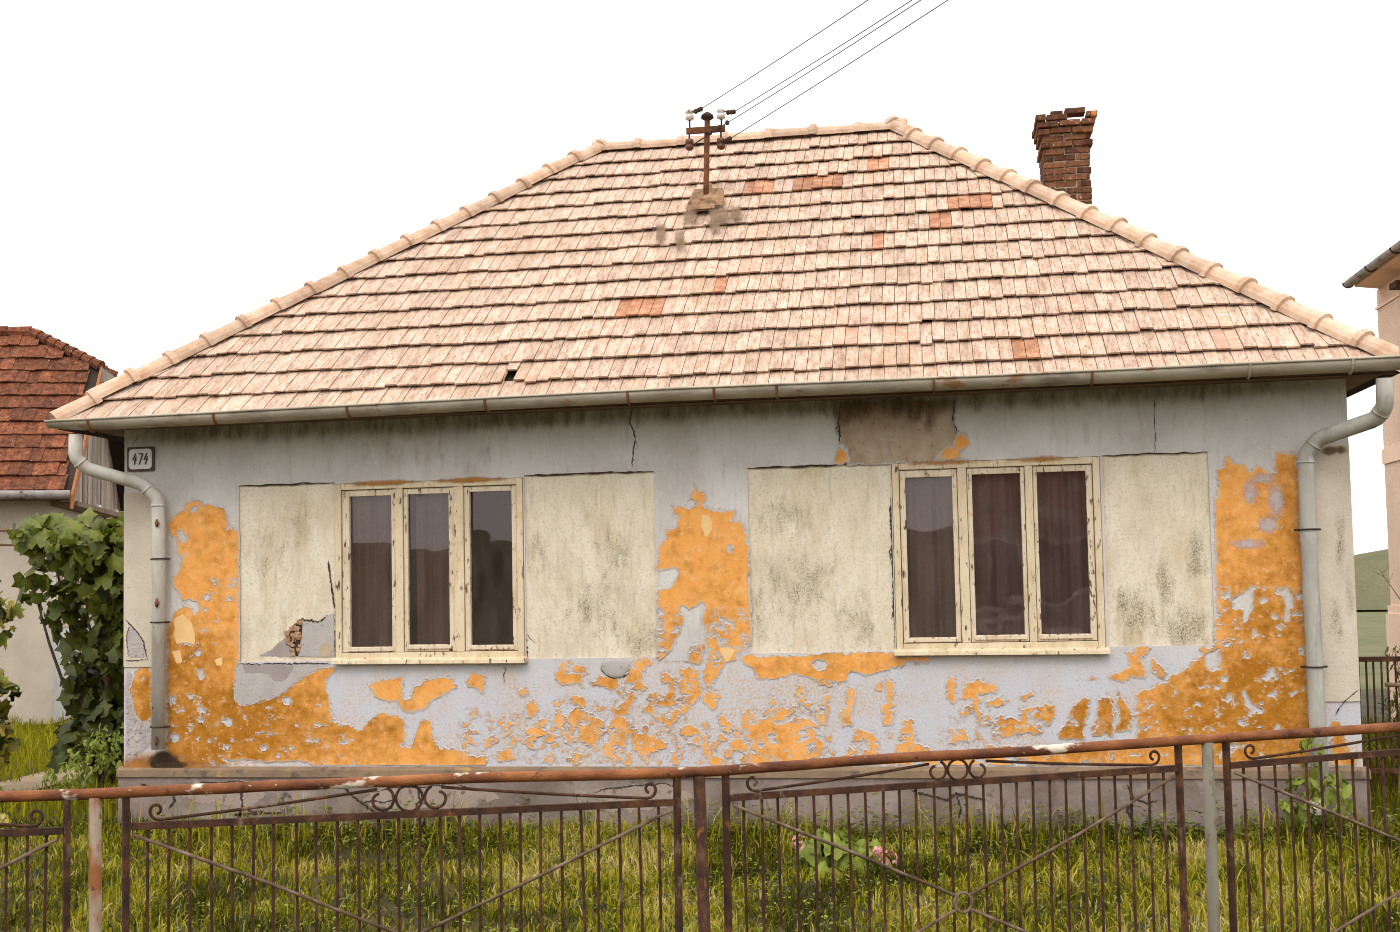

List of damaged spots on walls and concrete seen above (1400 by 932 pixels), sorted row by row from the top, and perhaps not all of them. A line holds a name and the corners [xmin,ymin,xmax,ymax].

crack [524,409,654,476]
peeling [832,397,971,466]
peeling [124,451,1310,813]